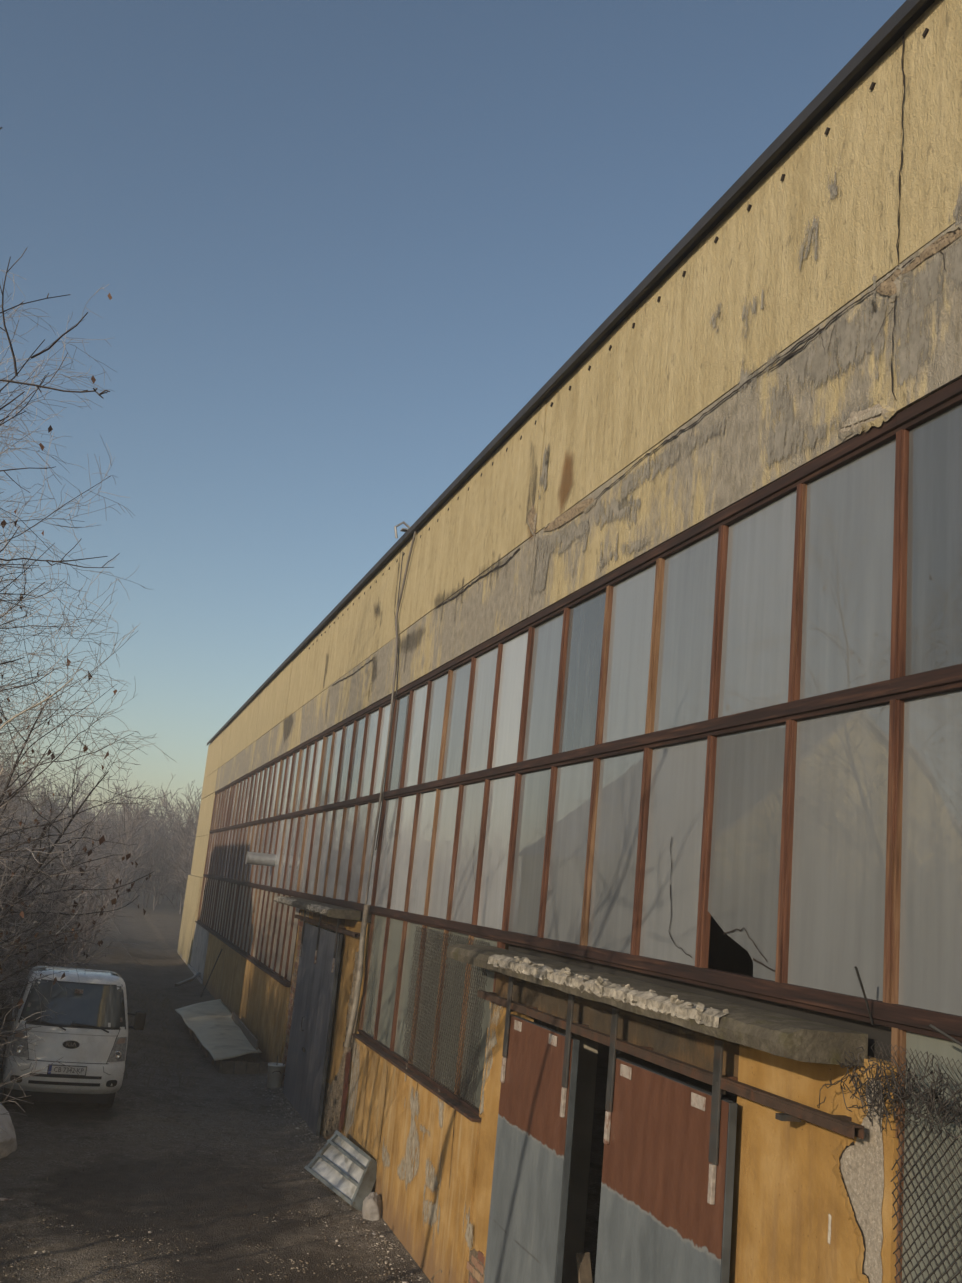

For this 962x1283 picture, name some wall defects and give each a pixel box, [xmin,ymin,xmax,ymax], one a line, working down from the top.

crack [595,36,961,499]
rust [560,458,571,506]
peeling [527,444,647,571]
peeling [382,1065,444,1239]
peeling [831,1063,887,1283]